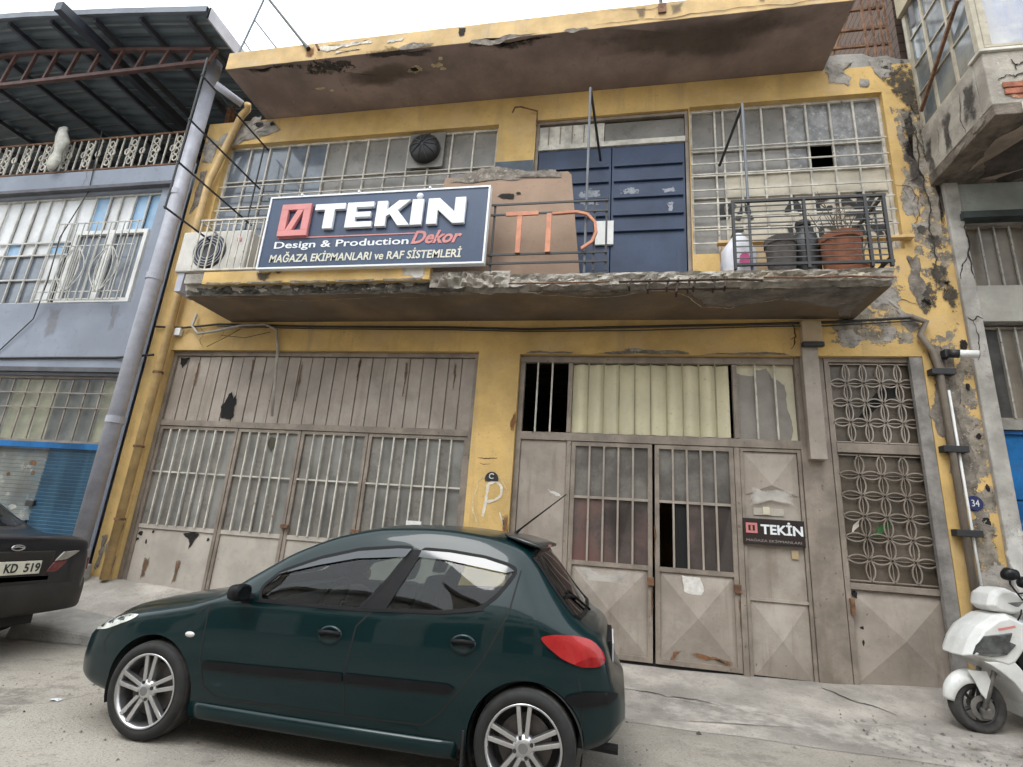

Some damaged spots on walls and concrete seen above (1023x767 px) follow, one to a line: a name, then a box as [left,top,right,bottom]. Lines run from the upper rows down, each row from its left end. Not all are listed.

peeling [320,39,372,54]
spalling [387,38,434,50]
spalling [471,33,535,46]
spalling [825,58,893,87]
crack [998,59,1023,80]
flaking render [1002,80,1023,98]
spalling [187,107,954,341]
peeling [838,328,866,348]
peeling [928,323,1023,597]